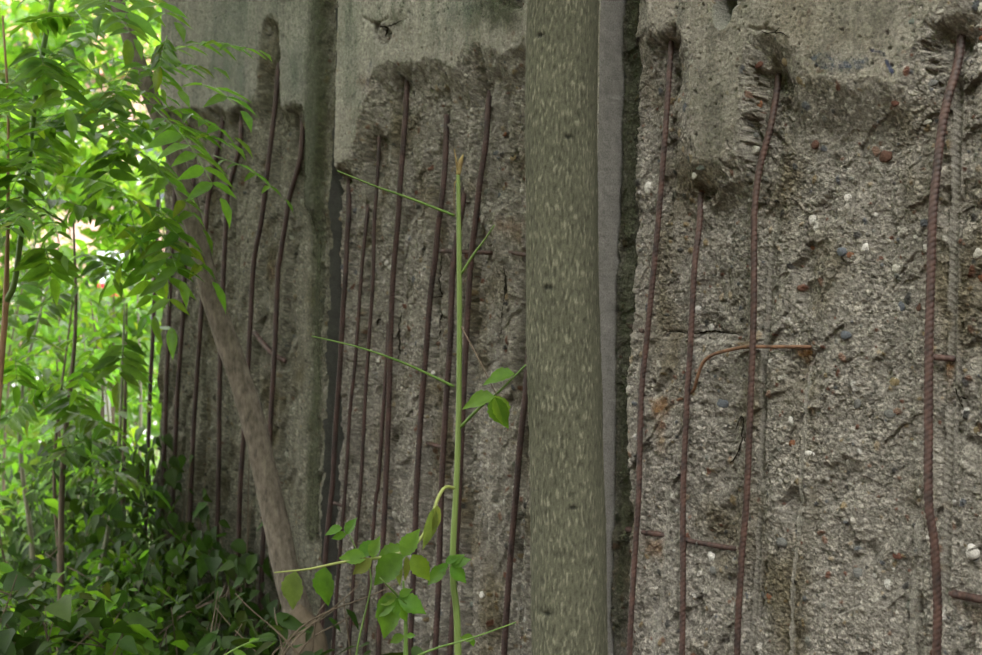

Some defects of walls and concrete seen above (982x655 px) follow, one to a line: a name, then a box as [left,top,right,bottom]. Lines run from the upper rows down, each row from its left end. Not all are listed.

spalling [152,0,532,655]
spalling [611,0,982,655]